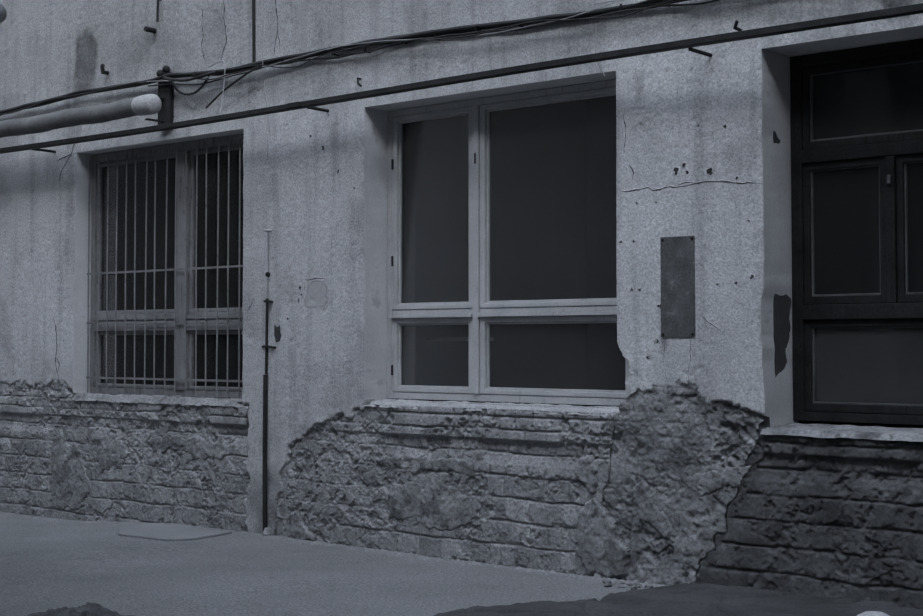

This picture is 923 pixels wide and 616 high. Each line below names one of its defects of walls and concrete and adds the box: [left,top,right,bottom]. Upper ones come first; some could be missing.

crack [620,115,762,192]
spalling [0,380,250,532]
spalling [275,378,923,610]